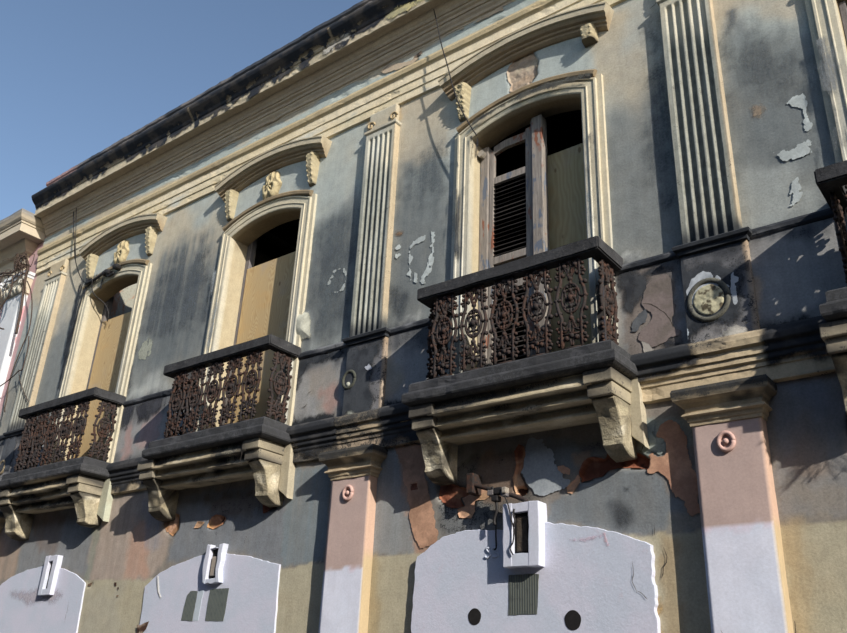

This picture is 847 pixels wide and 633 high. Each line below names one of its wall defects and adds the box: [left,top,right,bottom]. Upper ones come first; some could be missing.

water stain [31,0,416,209]
spalling [507,53,538,92]
peeling [777,93,813,161]
peeling [789,177,803,206]
peeling [395,231,435,284]
water stain [143,252,218,346]
flaking render [631,274,681,352]
flaking render [395,444,489,548]
flaking render [512,419,700,517]